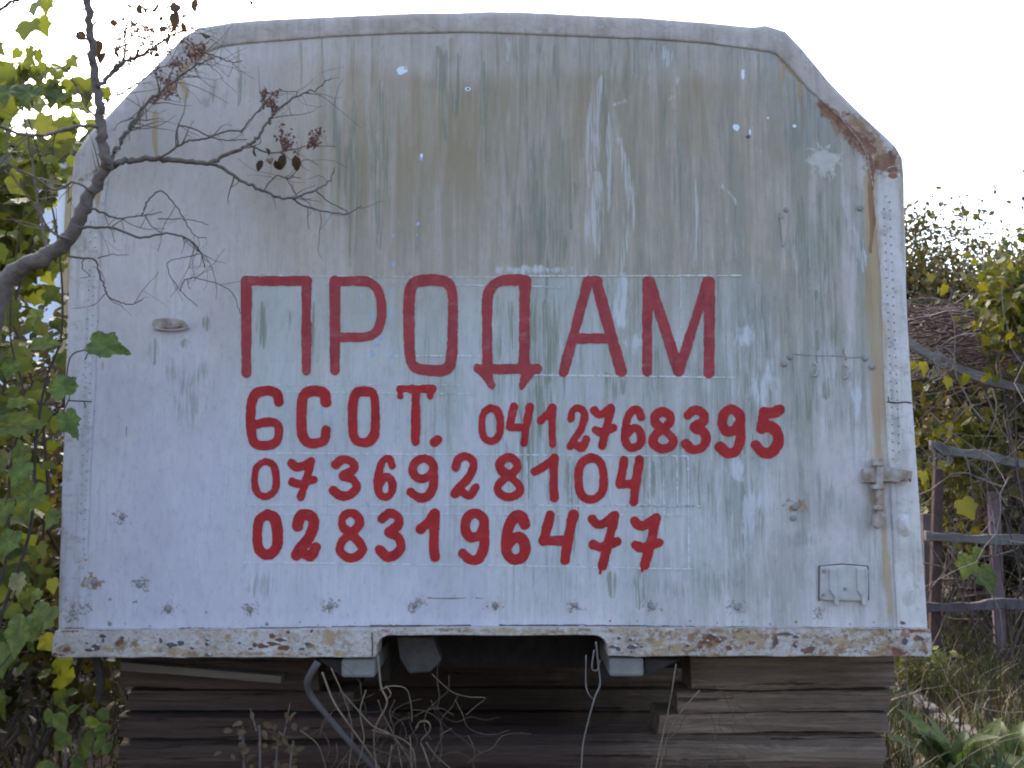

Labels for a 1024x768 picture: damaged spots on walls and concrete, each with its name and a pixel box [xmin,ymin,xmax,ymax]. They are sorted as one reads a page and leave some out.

damp [339,36,376,263]
damp [464,33,662,359]
corrosion [815,97,905,468]
corrosion [399,481,929,657]
peeling [85,630,106,652]
peeling [159,638,211,656]
peeling [238,630,313,651]
peeling [609,636,643,653]
peeling [686,634,733,650]
peeling [773,631,816,650]